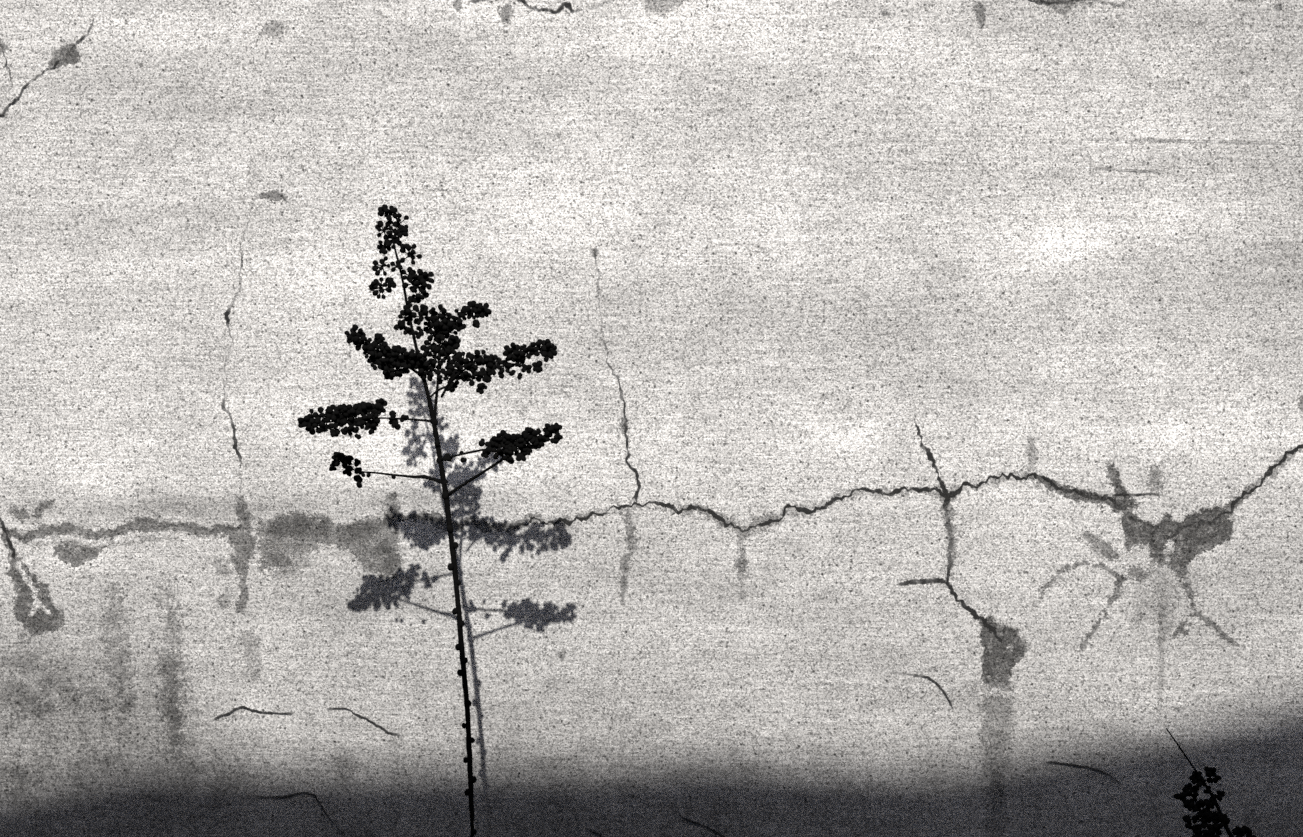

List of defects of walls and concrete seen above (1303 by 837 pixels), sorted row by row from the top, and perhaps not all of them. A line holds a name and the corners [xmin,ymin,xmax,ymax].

crack [452,0,577,23]
crack [223,308,231,326]
crack [221,399,242,463]
crack [396,341,1303,699]
crack [0,516,236,589]
damp [211,492,402,614]
crack [212,706,293,720]
crack [327,707,400,736]